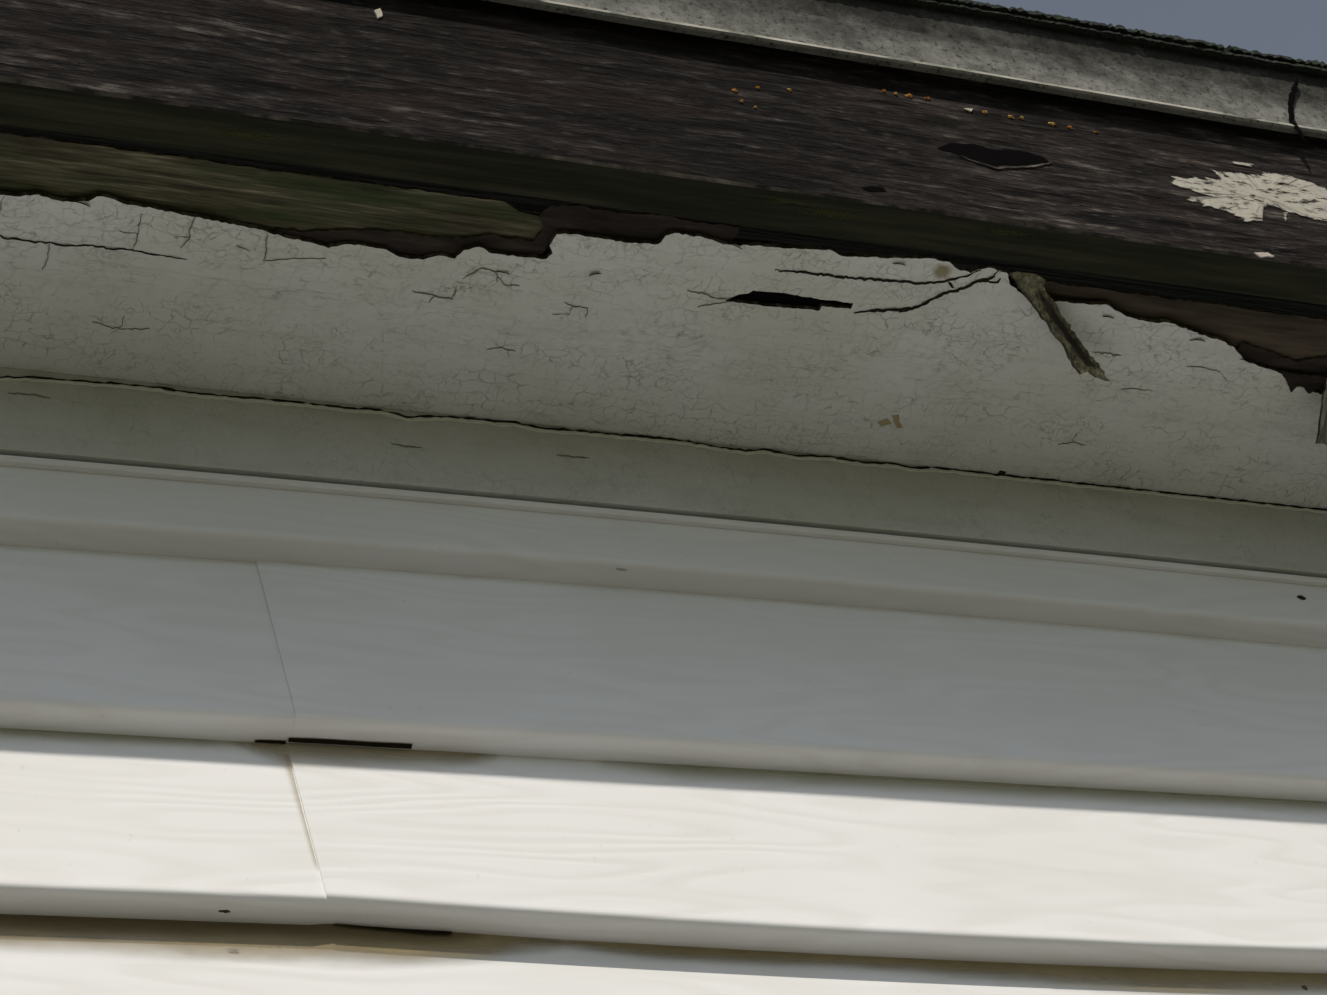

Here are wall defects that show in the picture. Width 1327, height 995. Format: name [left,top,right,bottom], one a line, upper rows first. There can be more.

crack [1288,79,1306,142]
peeling [0,131,790,256]
peeling [1171,161,1327,222]
crack [0,196,196,272]
crack [237,234,326,264]
crack [93,317,150,330]
crack [412,267,519,302]
crack [552,302,588,317]
crack [687,290,730,307]
crack [775,269,1001,314]
peeling [1044,280,1327,394]
crack [0,375,1327,514]